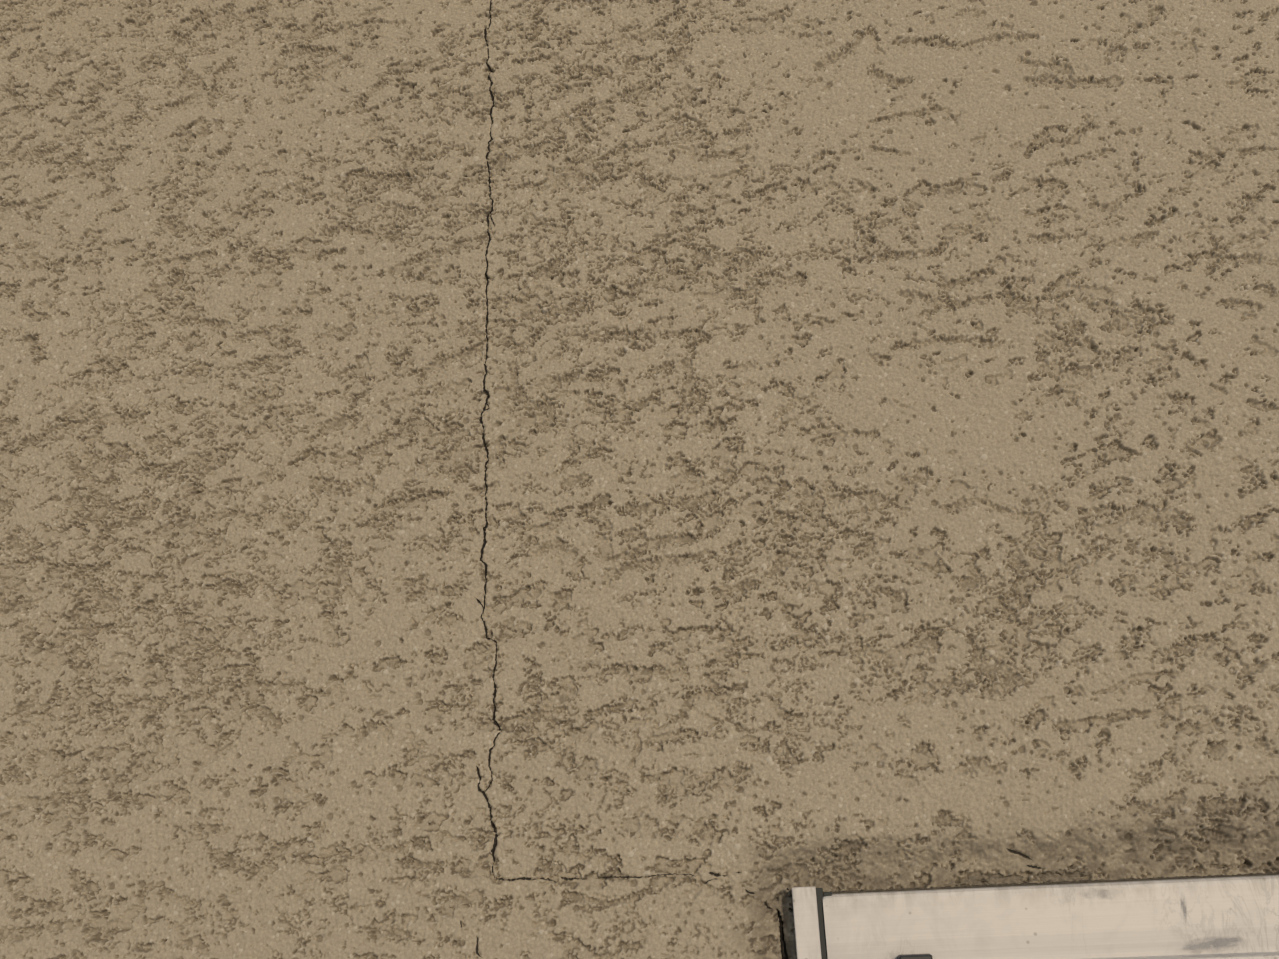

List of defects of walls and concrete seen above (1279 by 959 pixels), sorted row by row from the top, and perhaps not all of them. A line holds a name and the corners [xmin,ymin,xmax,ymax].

crack [476,1,792,910]